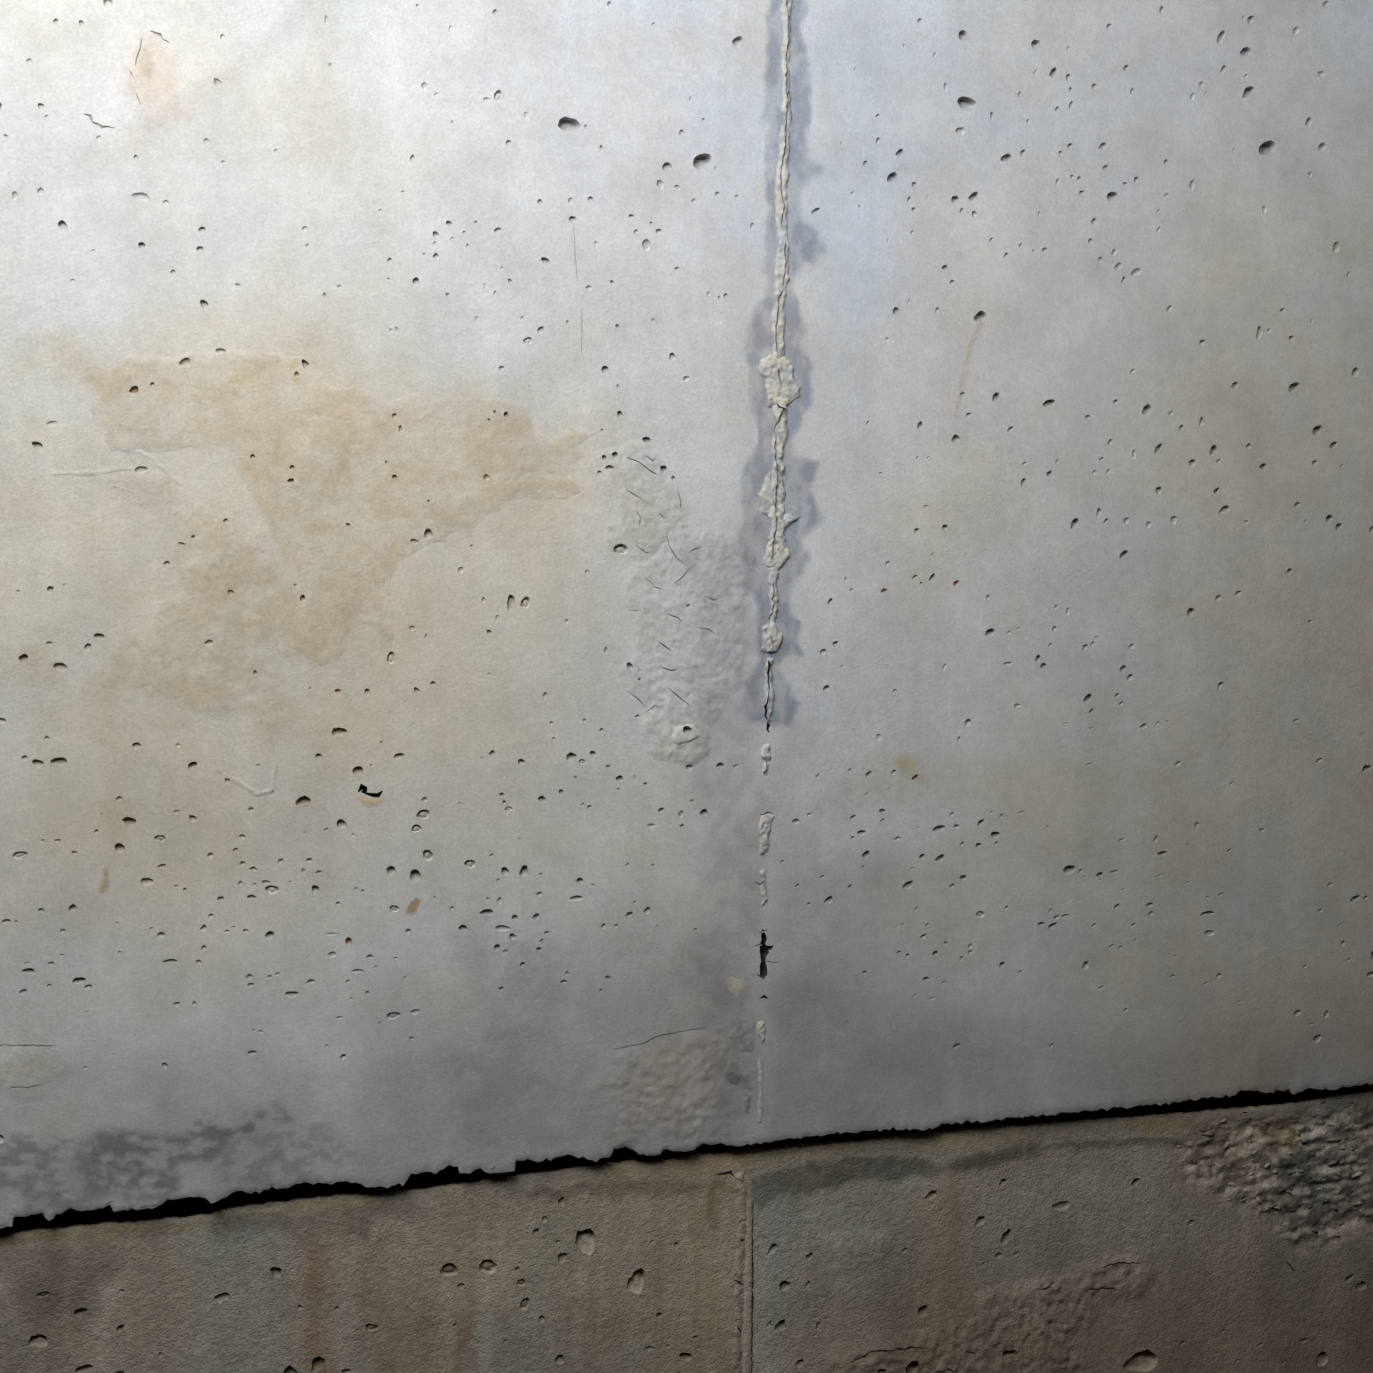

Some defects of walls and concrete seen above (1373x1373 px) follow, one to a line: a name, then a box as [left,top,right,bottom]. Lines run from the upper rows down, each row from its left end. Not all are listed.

crack [768,0,790,624]
crack [763,661,771,775]
water stain [422,0,1205,1231]
crack [755,929,780,999]
water stain [0,1091,430,1373]
water stain [436,1248,595,1373]
crack [0,1083,1373,1373]
spalling [1167,1092,1373,1261]